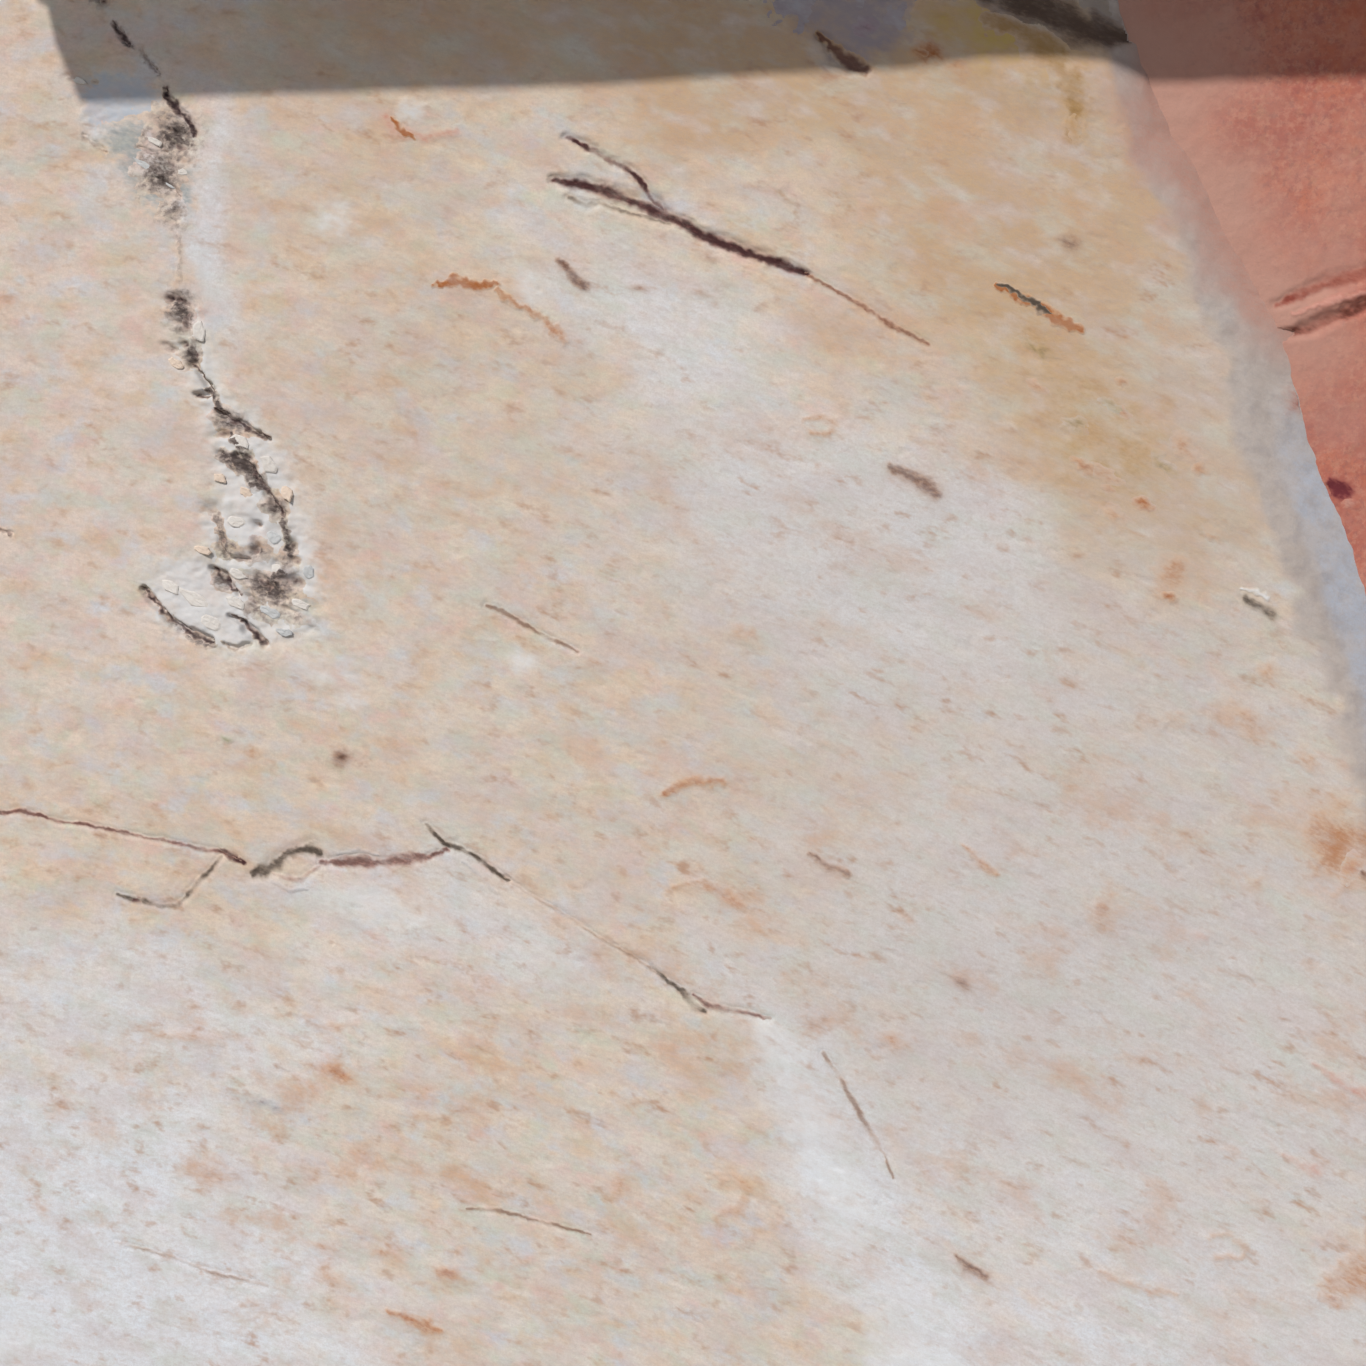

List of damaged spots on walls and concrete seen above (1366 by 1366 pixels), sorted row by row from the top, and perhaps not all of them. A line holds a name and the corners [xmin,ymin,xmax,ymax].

flaking render [739,0,917,96]
flaking render [975,0,1149,83]
crack [539,129,934,354]
spalling [52,0,410,717]
crack [0,798,772,1026]
crack [818,1049,897,1182]